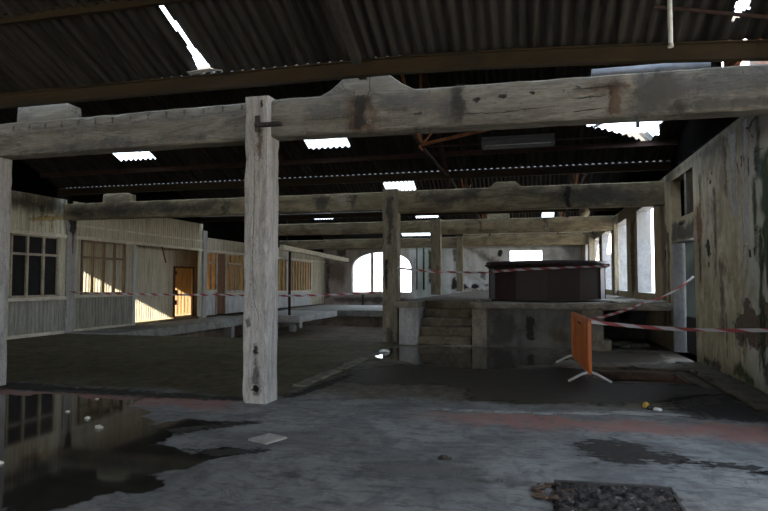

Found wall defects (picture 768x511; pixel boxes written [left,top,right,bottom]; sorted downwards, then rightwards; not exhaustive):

rust [592,81,629,114]
leakage [723,116,768,385]
peeling [731,296,768,366]
leakage [573,436,768,476]